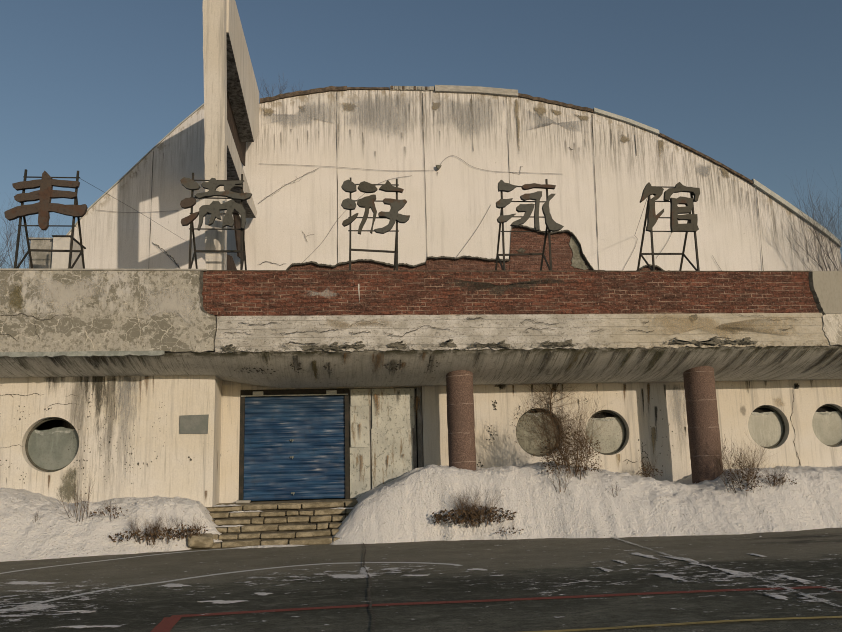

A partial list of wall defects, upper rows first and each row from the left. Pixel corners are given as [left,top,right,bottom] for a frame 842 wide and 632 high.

flaking render [286,225,594,271]
peeling [148,271,217,322]
crack [0,313,56,341]
spalling [301,341,366,351]
spalling [468,340,510,349]
spalling [540,339,578,348]
damp [80,356,143,429]